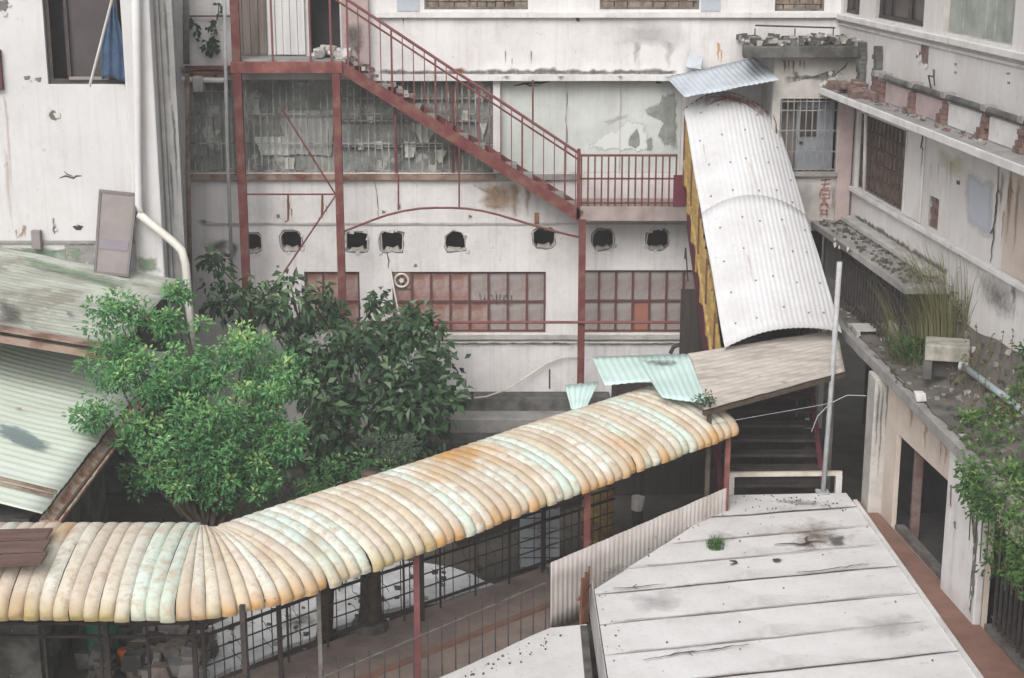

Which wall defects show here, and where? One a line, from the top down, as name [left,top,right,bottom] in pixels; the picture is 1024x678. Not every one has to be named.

spalling [916,45,935,76]
peeling [589,117,648,152]
crack [990,166,1014,262]
damp [876,388,888,452]